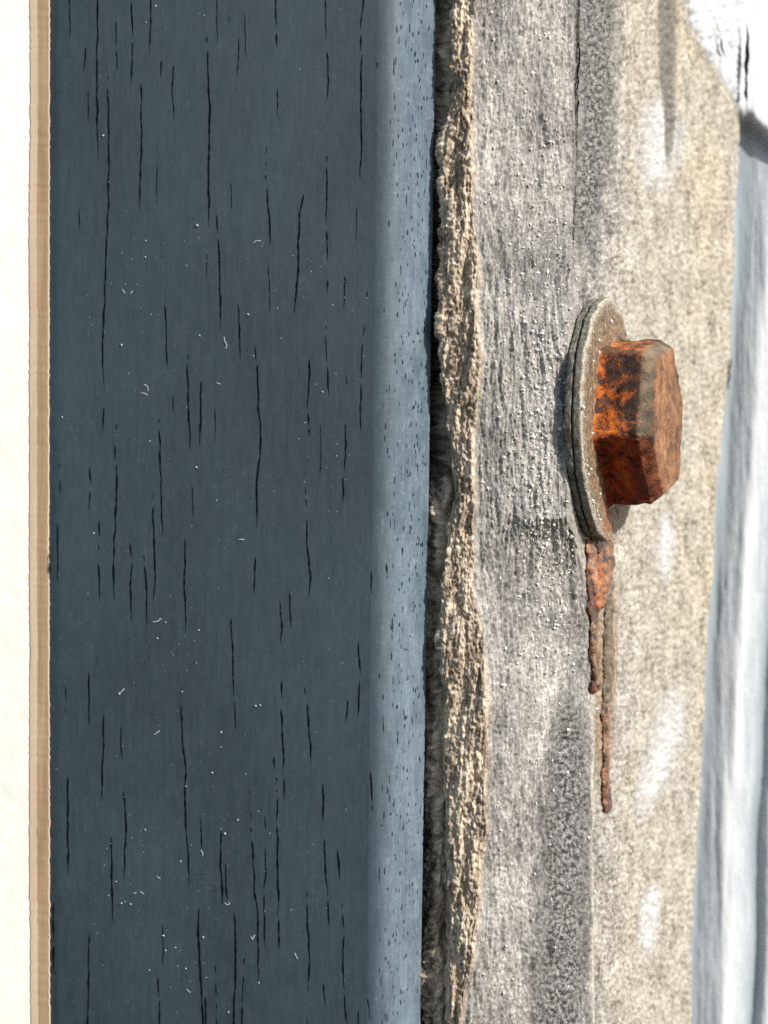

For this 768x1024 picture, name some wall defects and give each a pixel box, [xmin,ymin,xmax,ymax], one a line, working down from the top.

crack [574,30,582,134]
rust [586,540,615,812]
leakage [531,696,590,1024]